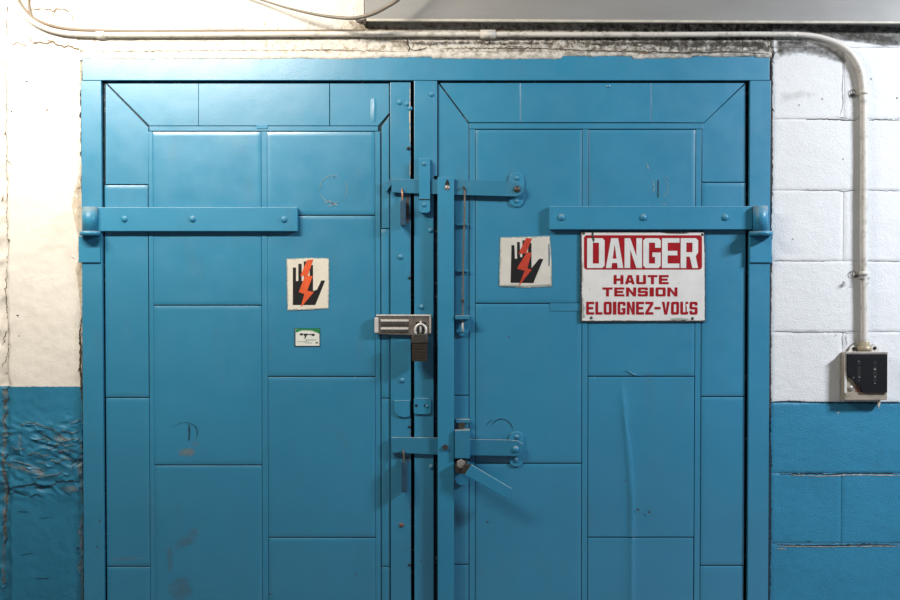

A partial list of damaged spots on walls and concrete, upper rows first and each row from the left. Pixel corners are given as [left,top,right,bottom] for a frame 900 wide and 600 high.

damp [350,8,552,46]
damp [769,24,900,61]